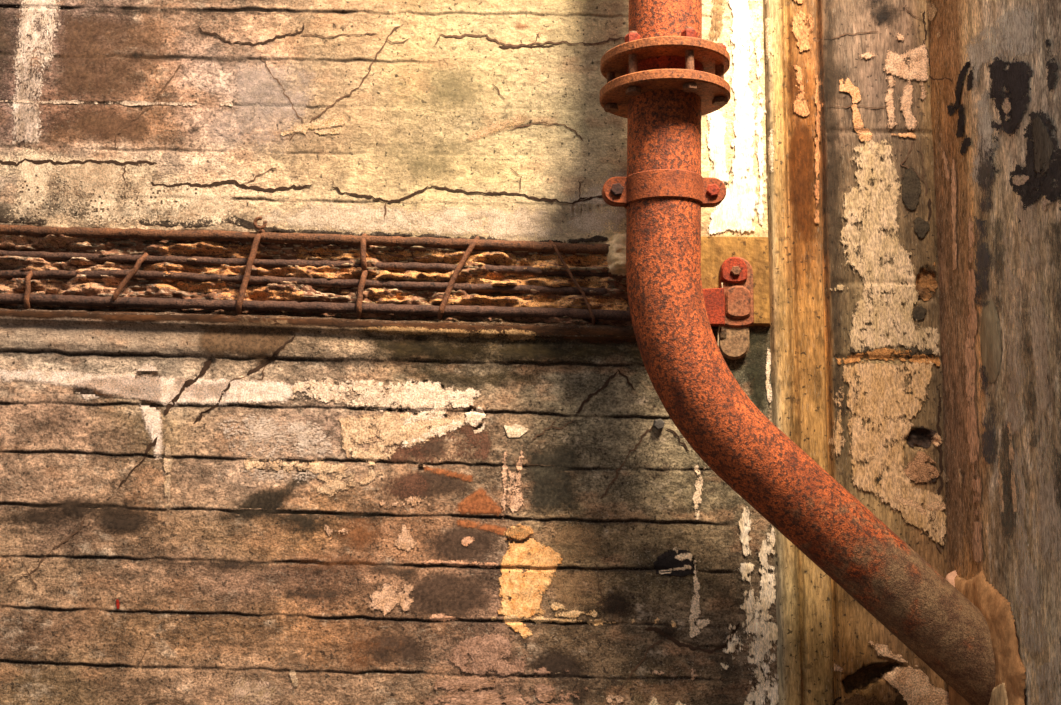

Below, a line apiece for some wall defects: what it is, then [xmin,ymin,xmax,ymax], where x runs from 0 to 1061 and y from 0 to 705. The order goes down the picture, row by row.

crack [0,64,603,219]
crack [198,24,410,140]
crack [435,33,625,49]
spalling [0,179,633,327]
rust [0,308,637,344]
peeling [826,32,984,563]
crack [119,335,295,487]
peeling [208,375,608,705]
rust [425,466,508,535]
peeling [692,465,707,520]
peeling [720,505,779,705]
spalling [834,641,950,705]